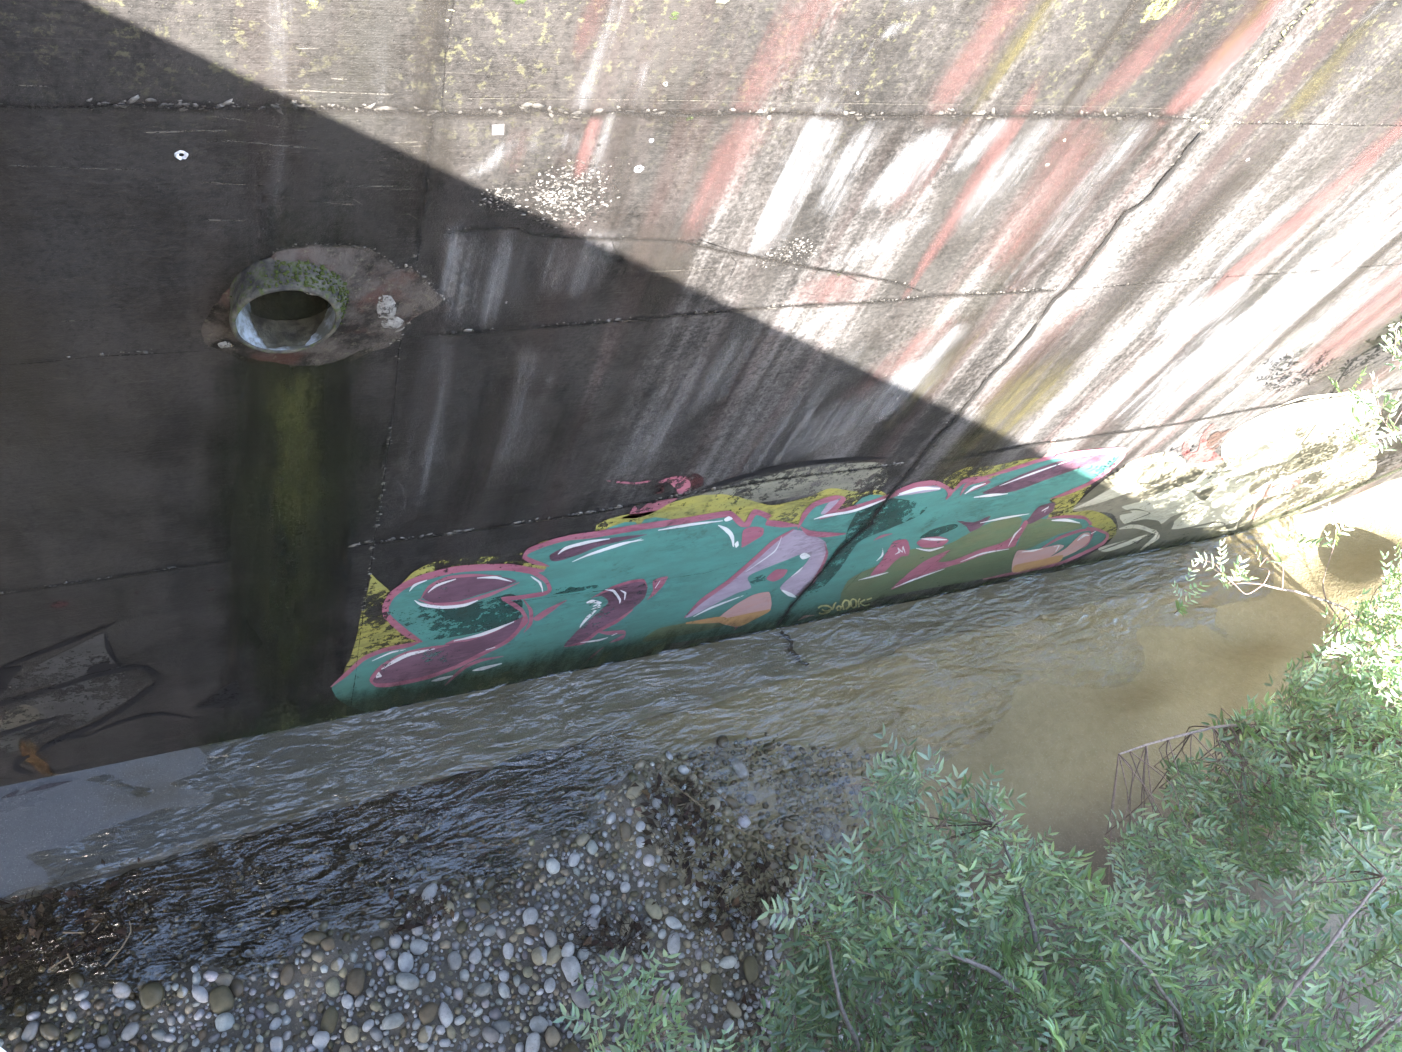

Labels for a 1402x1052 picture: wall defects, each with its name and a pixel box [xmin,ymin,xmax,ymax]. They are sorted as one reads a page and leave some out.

flaking render [479,157,620,230]
damp [853,321,972,425]